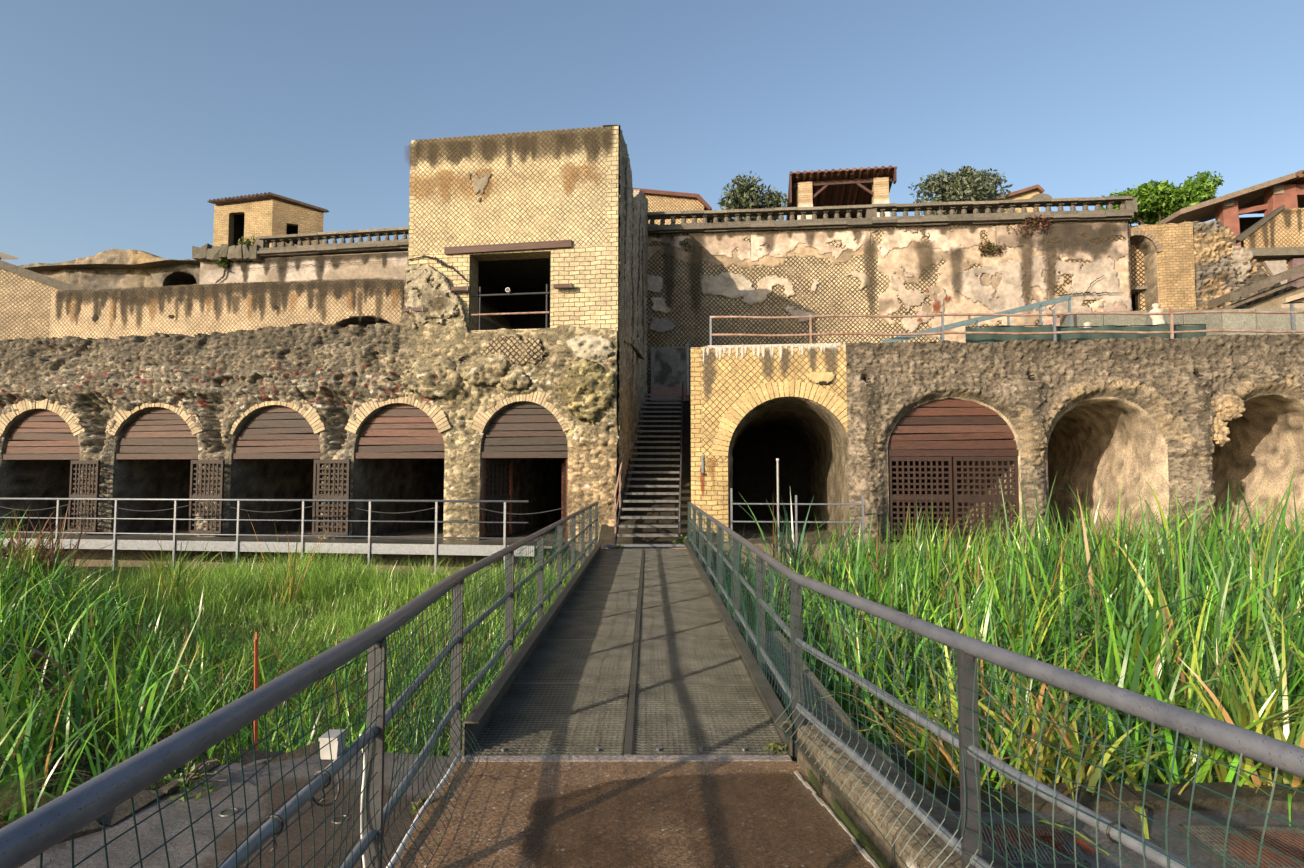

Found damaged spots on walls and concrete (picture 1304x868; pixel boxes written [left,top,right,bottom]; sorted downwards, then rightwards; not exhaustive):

damp [408,126,613,165]
damp [56,252,408,319]
flaking render [647,222,1132,343]
damp [703,343,846,394]
damp [523,774,874,868]
corrosion [983,827,1094,855]
corrosion [1231,831,1304,868]